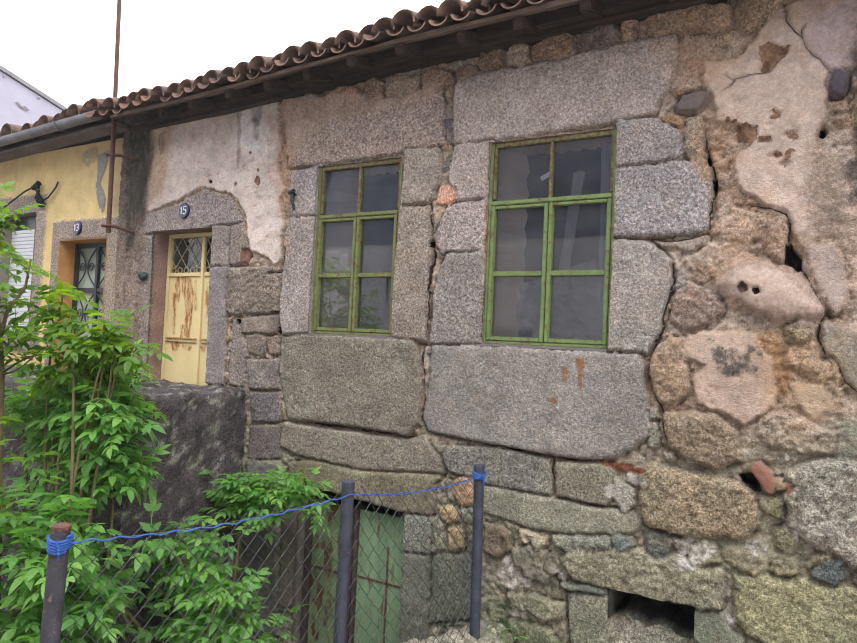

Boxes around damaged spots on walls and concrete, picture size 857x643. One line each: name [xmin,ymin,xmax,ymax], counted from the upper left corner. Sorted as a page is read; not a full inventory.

spalling [759,41,790,74]
crack [783,0,830,73]
peeling [96,150,109,212]
leakage [123,126,163,247]
crack [647,133,718,242]
spalling [725,116,771,147]
spalling [774,133,799,168]
corrosion [172,277,208,350]
crack [755,206,857,392]